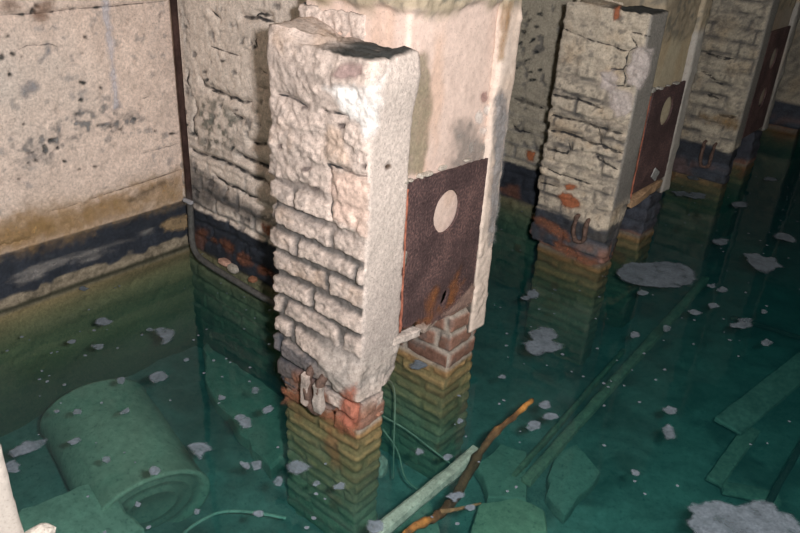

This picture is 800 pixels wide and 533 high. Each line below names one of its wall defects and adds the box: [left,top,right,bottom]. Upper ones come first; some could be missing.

crack [564,28,651,87]
crack [514,94,623,187]
corrosion [399,189,409,333]
flaking render [536,218,596,265]
corrosion [442,284,475,316]
flaking render [319,388,360,437]